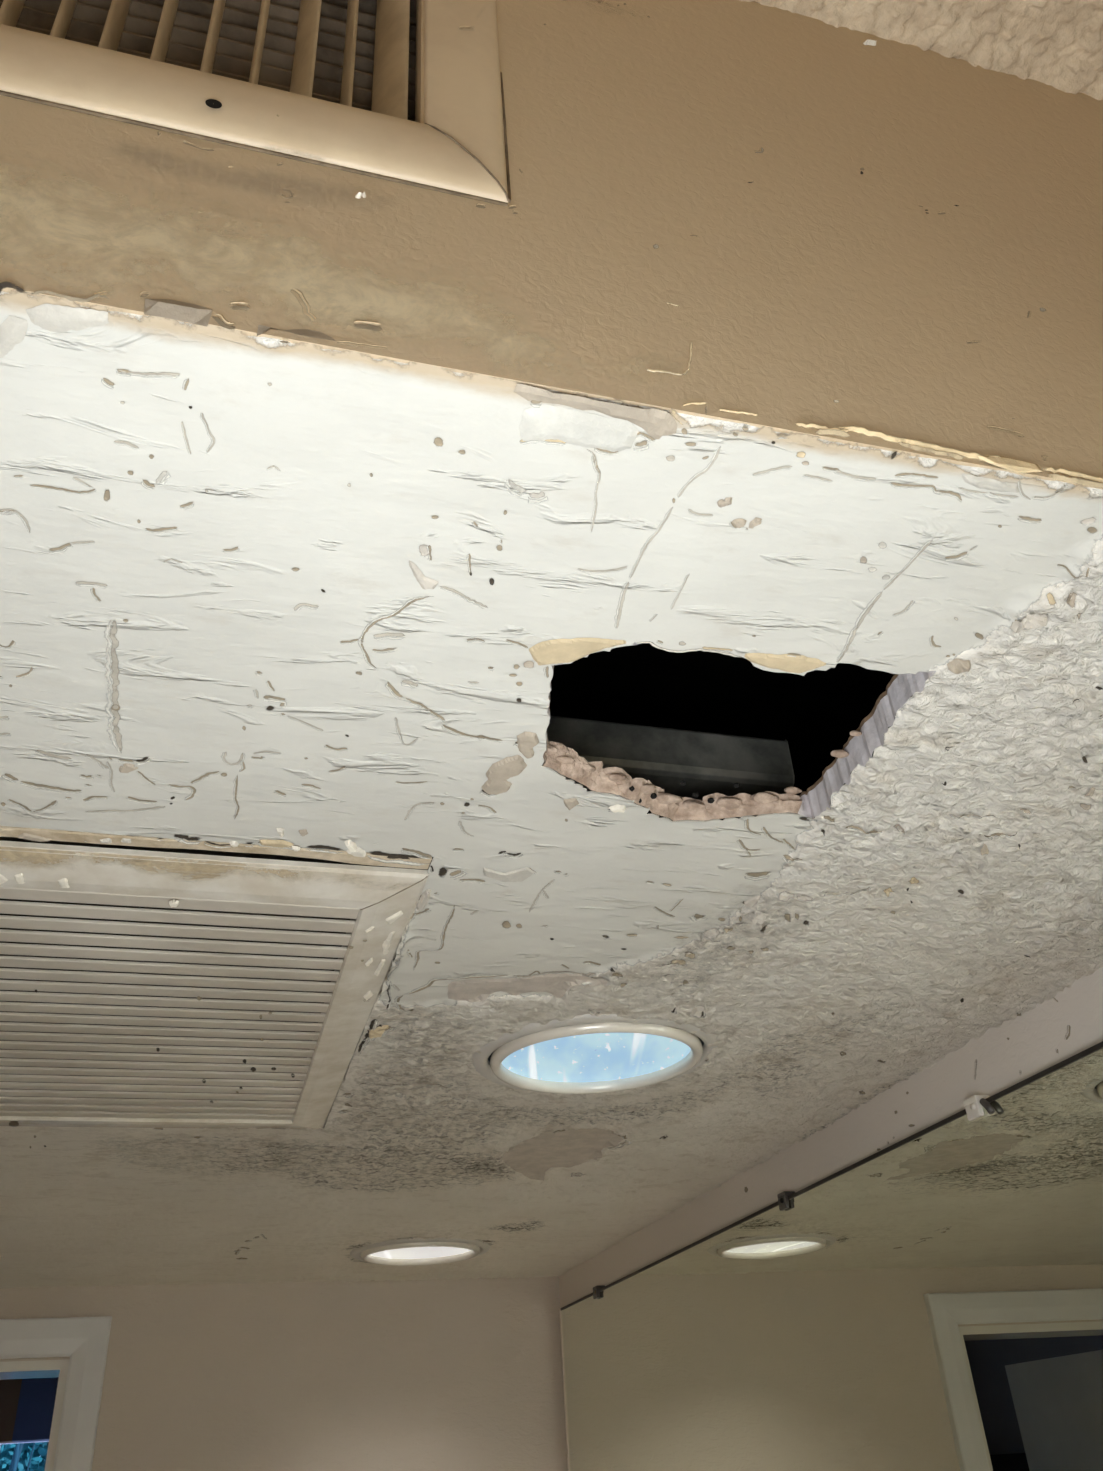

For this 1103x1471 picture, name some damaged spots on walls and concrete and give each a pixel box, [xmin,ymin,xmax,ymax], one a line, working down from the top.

crack [102,369,215,454]
crack [835,460,1061,502]
crack [579,447,721,628]
crack [837,540,1091,662]
crack [0,475,502,866]
peeling [0,289,1103,1054]
crack [737,817,810,863]
crack [846,825,882,834]
crack [950,813,1017,840]
peeling [502,1128,632,1181]